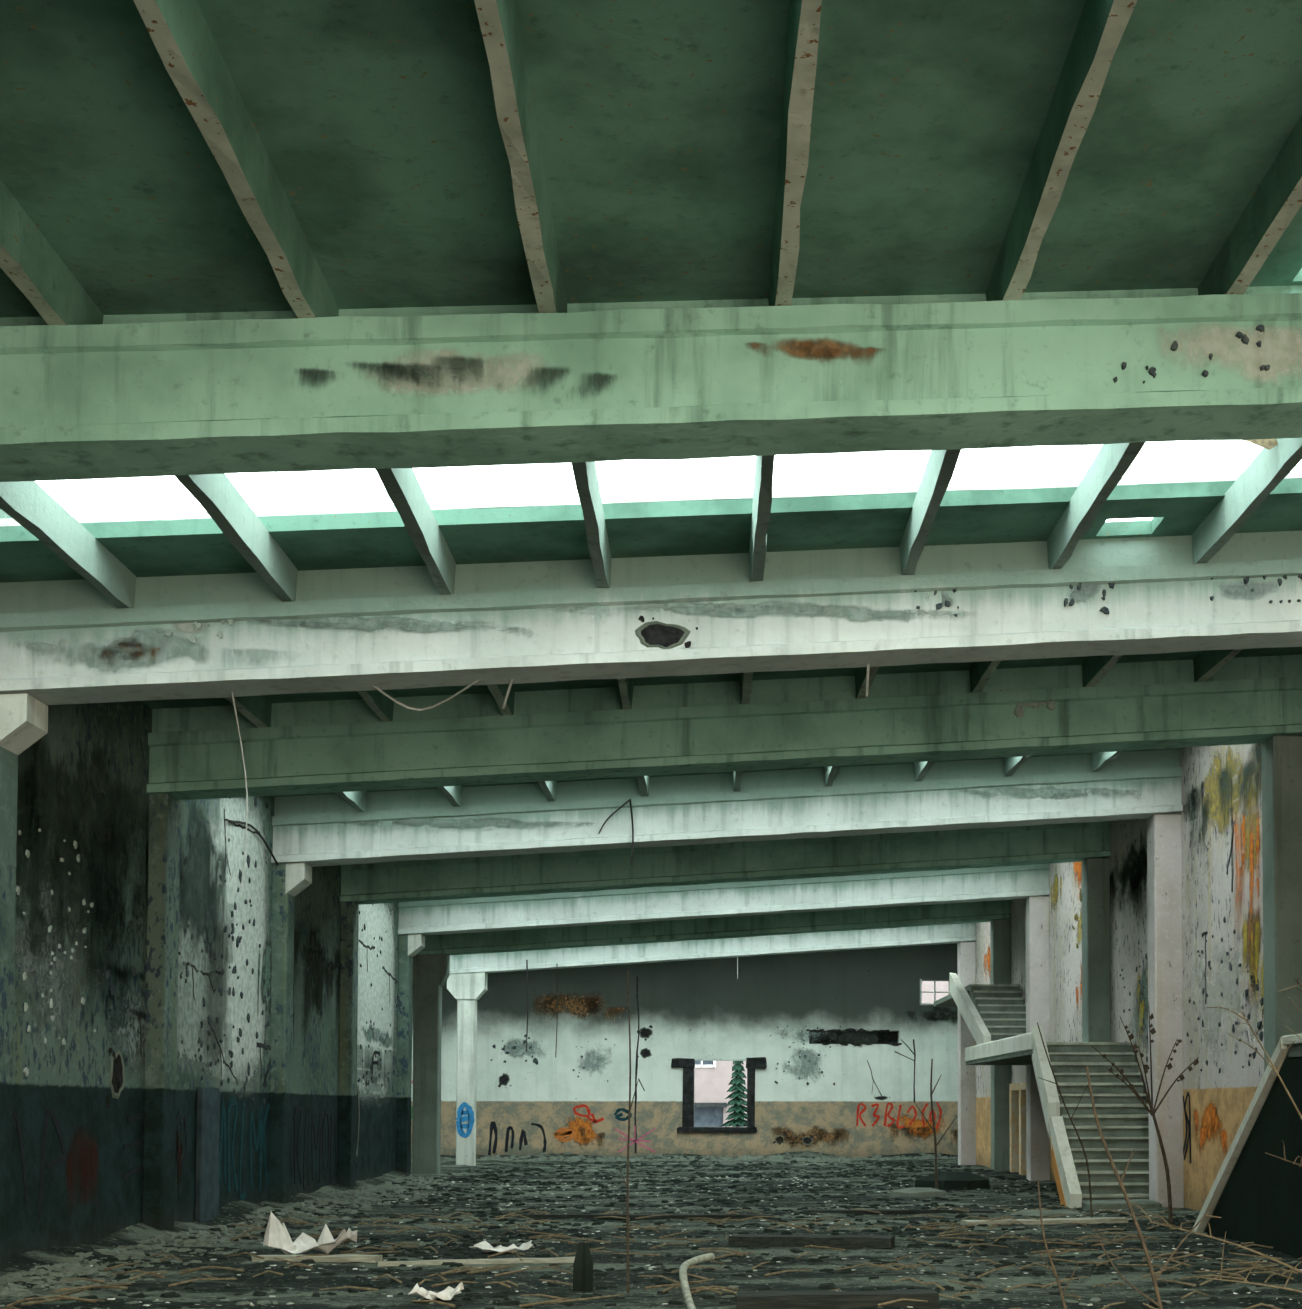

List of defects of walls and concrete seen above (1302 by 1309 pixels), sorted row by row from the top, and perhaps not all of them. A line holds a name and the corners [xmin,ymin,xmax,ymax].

corrosion [779,339,879,359]
peeling [1235,325,1265,347]
spalling [635,615,698,649]
corrosion [102,640,159,660]
water stain [16,740,149,985]
water stain [179,805,226,958]